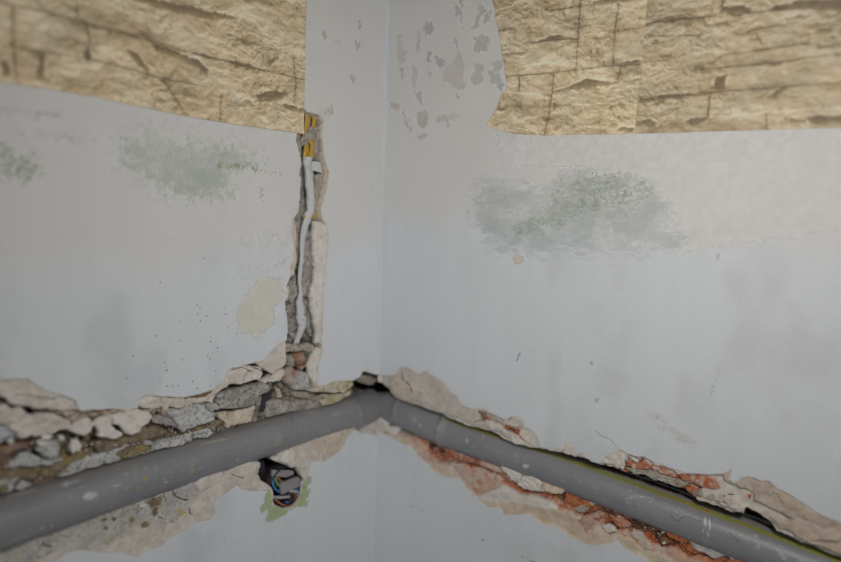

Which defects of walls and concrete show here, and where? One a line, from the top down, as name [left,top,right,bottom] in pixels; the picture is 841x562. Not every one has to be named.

flaking render [0,340,841,562]